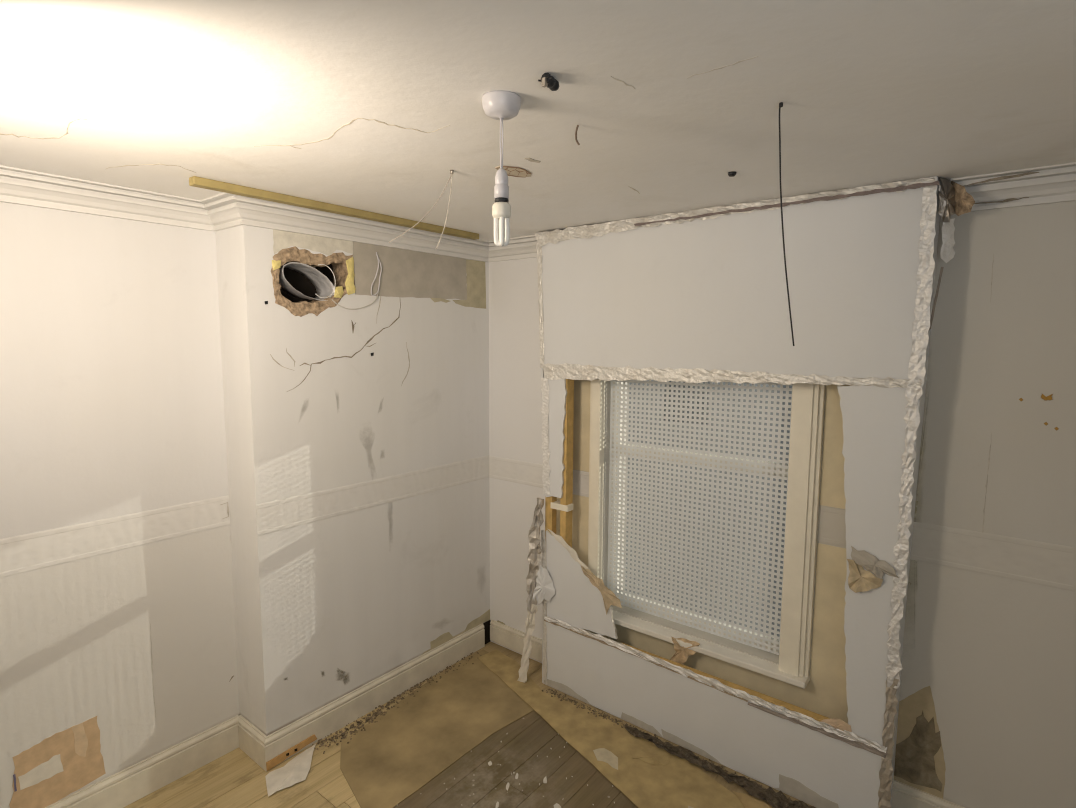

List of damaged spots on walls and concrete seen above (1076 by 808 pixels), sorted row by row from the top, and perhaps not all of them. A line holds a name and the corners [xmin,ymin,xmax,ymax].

crack [0,118,90,139]
crack [254,118,450,149]
hole [271,246,356,317]
crack [270,296,410,392]